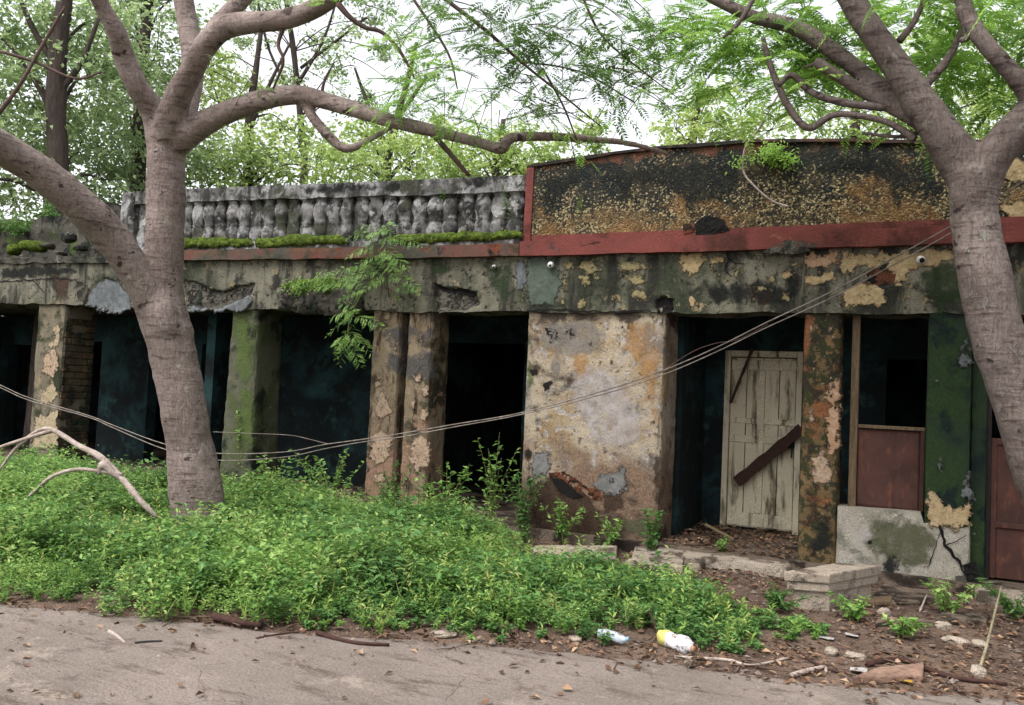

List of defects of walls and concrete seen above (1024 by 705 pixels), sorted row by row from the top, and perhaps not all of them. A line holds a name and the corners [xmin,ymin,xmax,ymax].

leakage [608,164,738,216]
leakage [815,158,941,207]
spalling [433,283,480,313]
peeling [611,259,673,315]
peeling [676,240,954,310]
flaking render [31,279,131,460]
peeling [406,434,433,474]
peeling [808,377,843,484]
rust [856,428,920,511]
spalling [925,471,976,533]
mould [864,520,936,573]
crack [925,507,969,582]